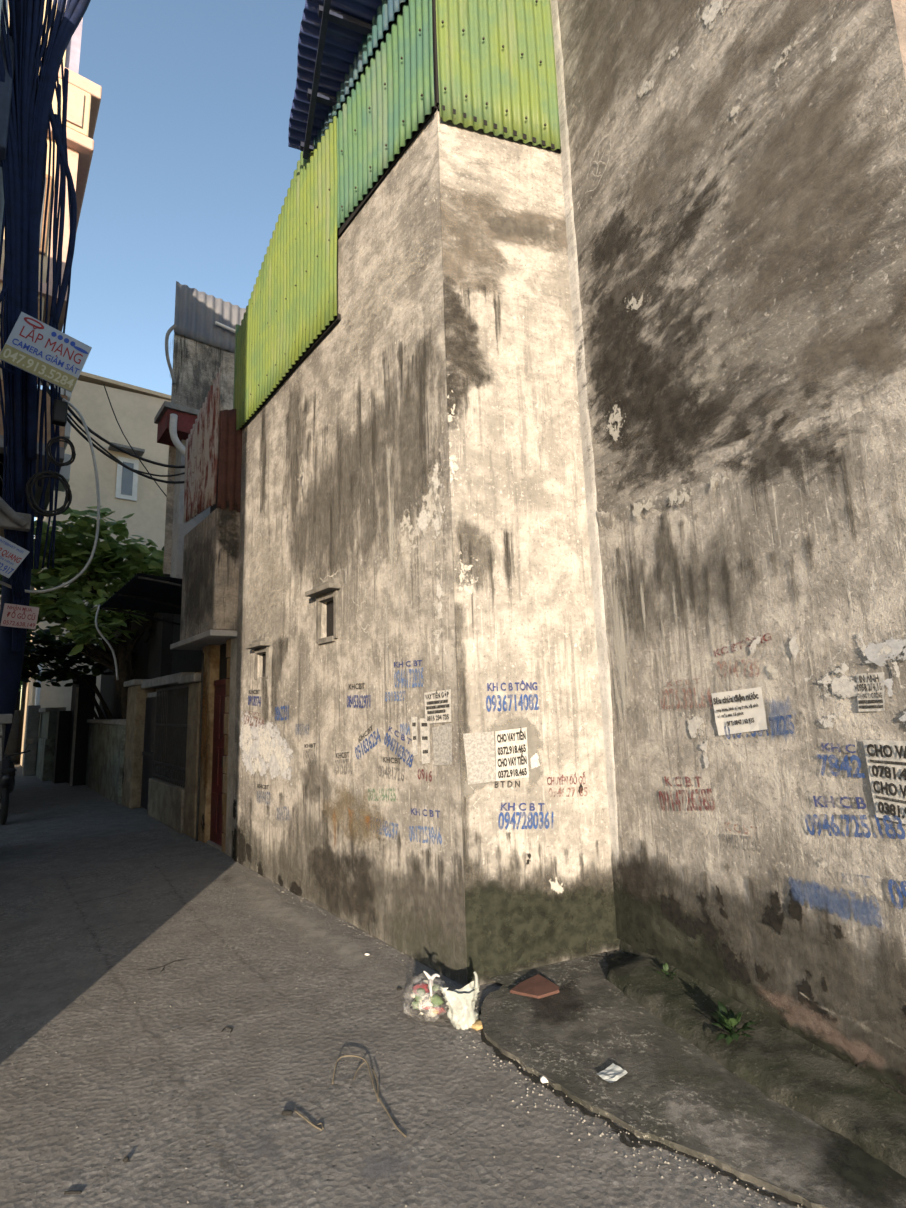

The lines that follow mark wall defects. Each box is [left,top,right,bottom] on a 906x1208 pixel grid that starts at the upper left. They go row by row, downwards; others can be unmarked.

damp [283,186,568,591]
damp [571,0,906,721]
damp [237,522,906,1075]
peeling [818,630,906,728]
crack [479,1003,808,1208]